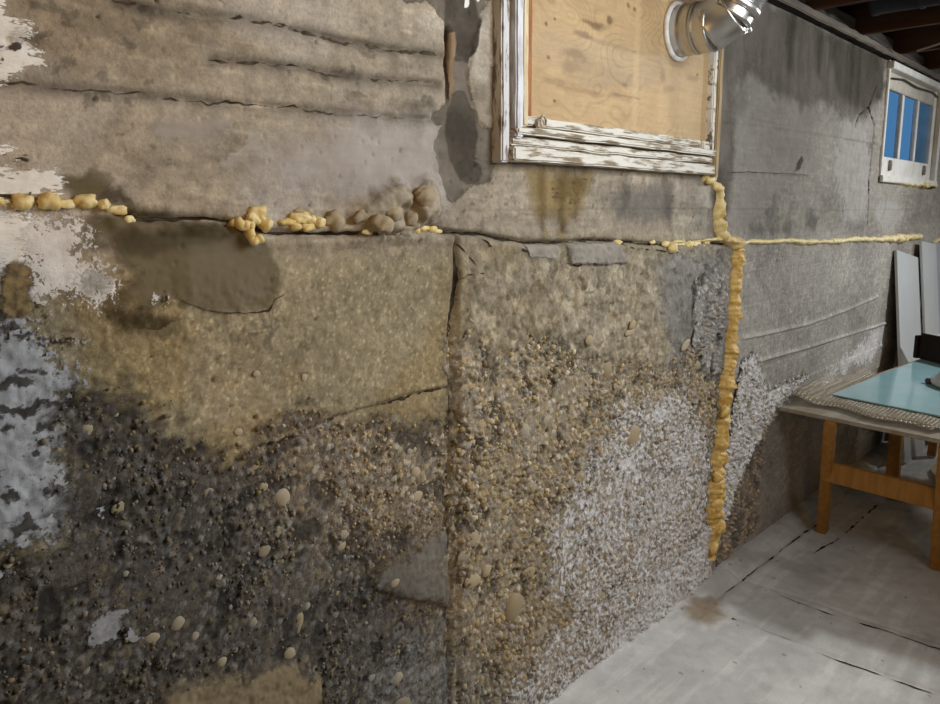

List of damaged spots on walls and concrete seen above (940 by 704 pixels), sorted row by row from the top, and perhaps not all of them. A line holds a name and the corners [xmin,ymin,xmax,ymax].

peeling [0,0,51,87]
crack [2,81,399,118]
crack [113,0,437,56]
crack [211,59,341,77]
damp [246,0,495,202]
damp [62,171,110,195]
crack [123,214,230,227]
damp [88,201,279,311]
crack [176,292,286,315]
peeling [0,142,124,578]
crack [255,226,679,567]
crack [725,505,878,593]